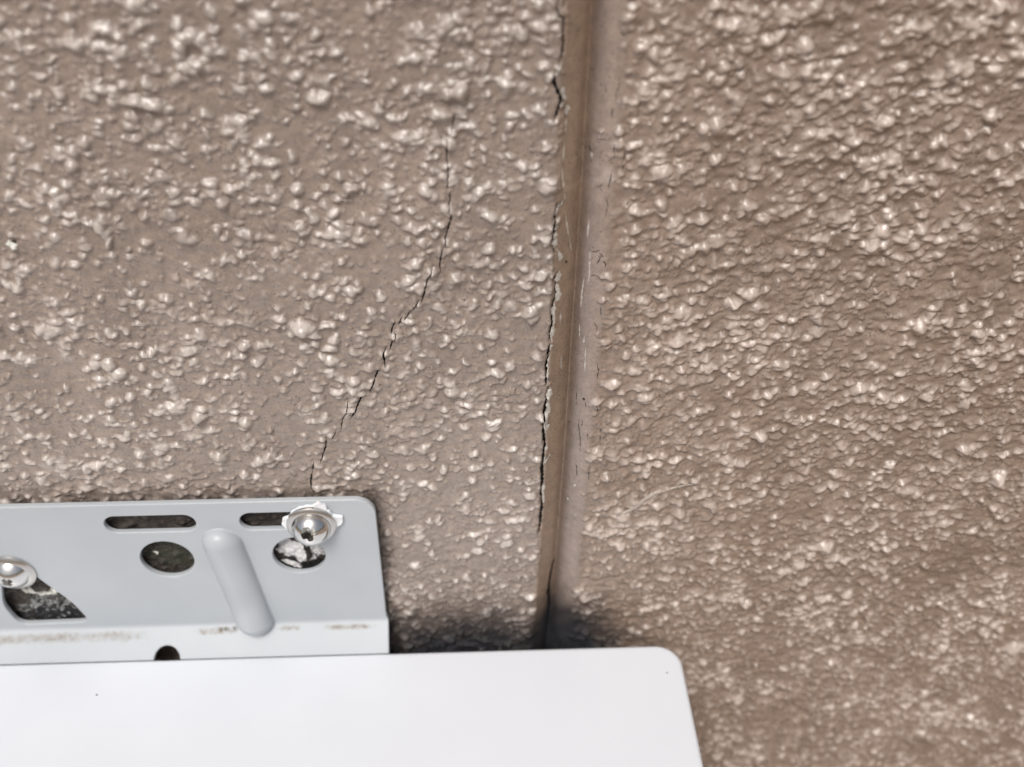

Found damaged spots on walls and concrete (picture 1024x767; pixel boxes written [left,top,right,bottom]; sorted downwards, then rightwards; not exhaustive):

crack [552,0,570,122]
crack [310,115,455,492]
crack [538,200,601,532]